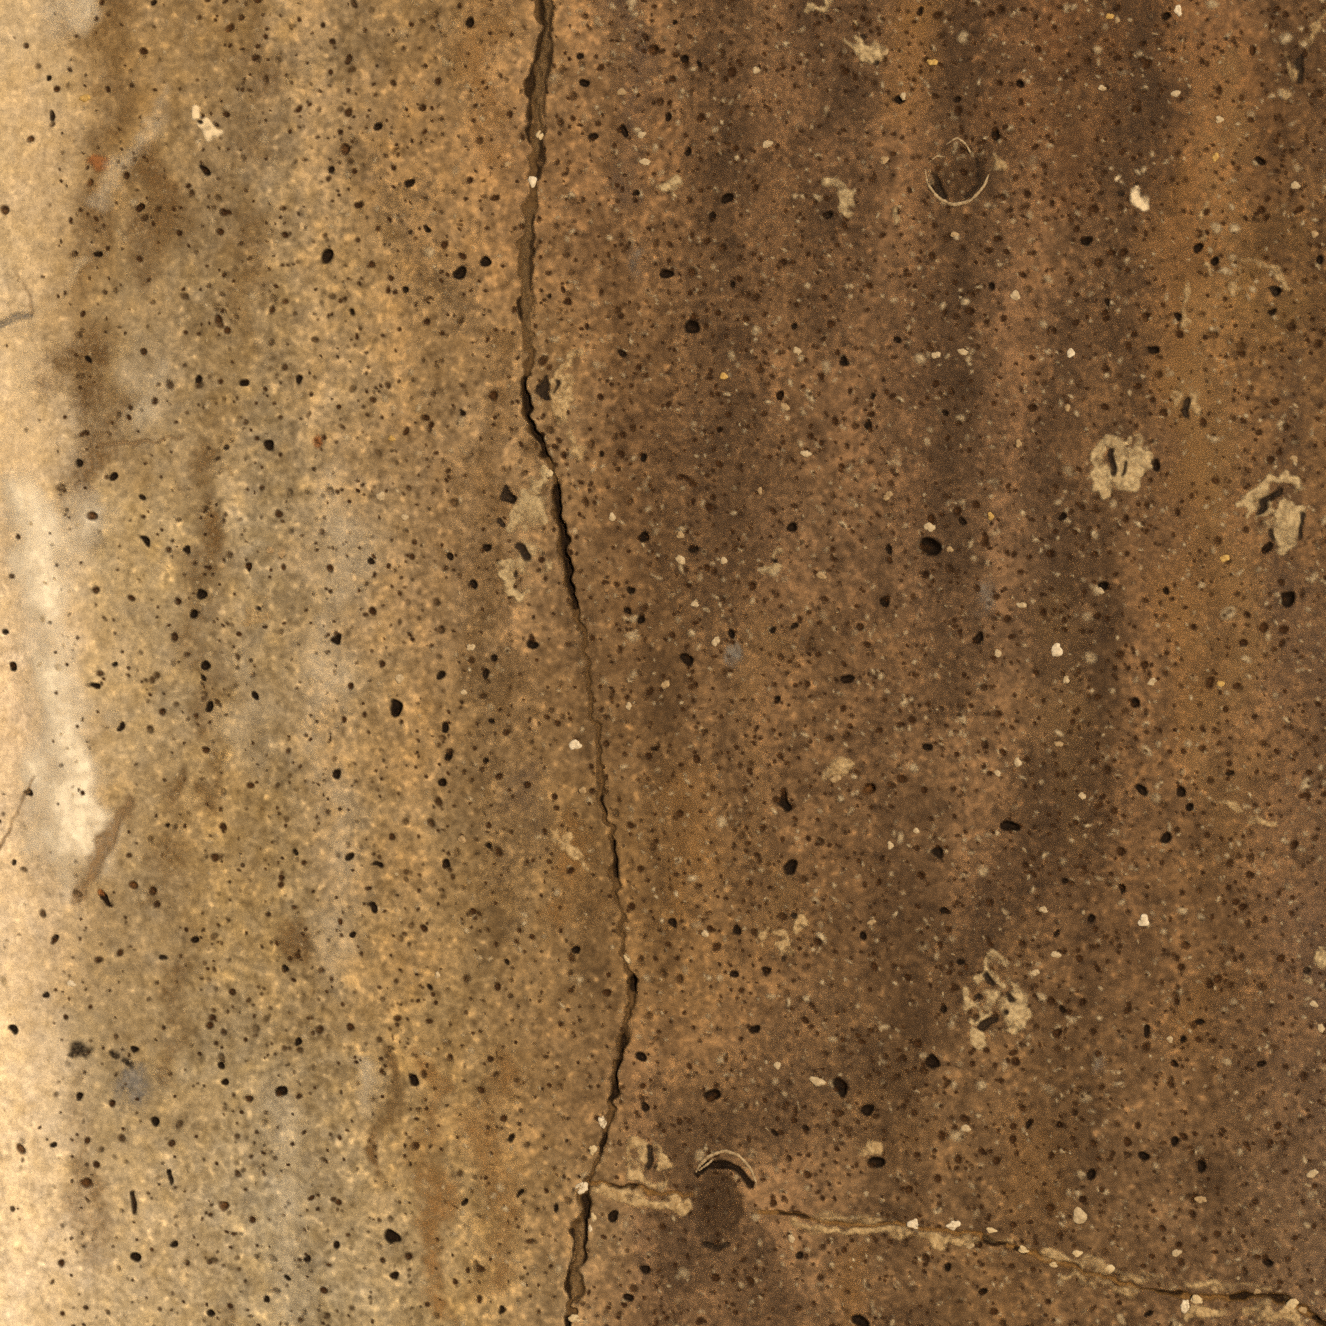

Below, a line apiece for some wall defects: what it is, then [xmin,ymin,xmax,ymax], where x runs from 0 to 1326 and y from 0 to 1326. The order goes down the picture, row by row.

crack [516,0,692,1326]
leakage [597,0,1326,1326]
crack [73,796,134,903]
crack [129,1191,137,1214]
crack [757,1210,1326,1326]